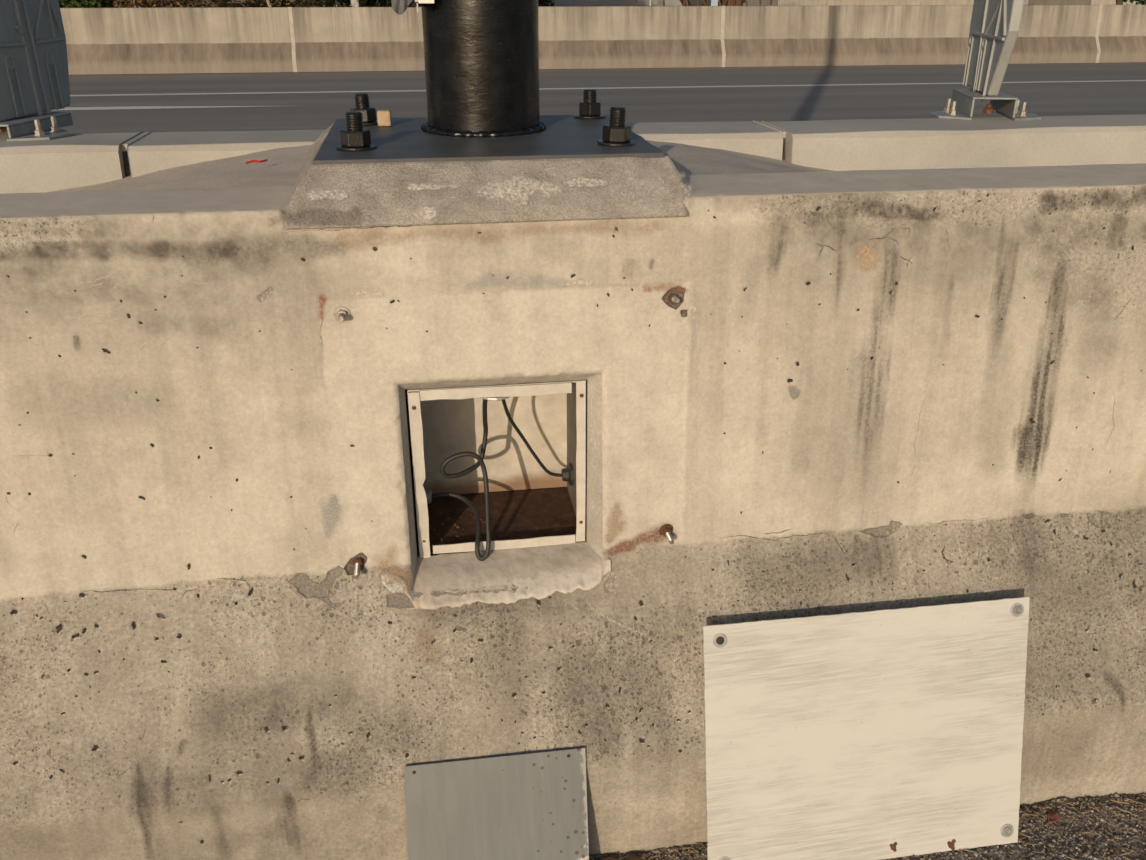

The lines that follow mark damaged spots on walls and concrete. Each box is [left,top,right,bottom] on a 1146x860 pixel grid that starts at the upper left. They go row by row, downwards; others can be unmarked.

damp [1018,279,1063,471]
corrosion [606,506,664,554]